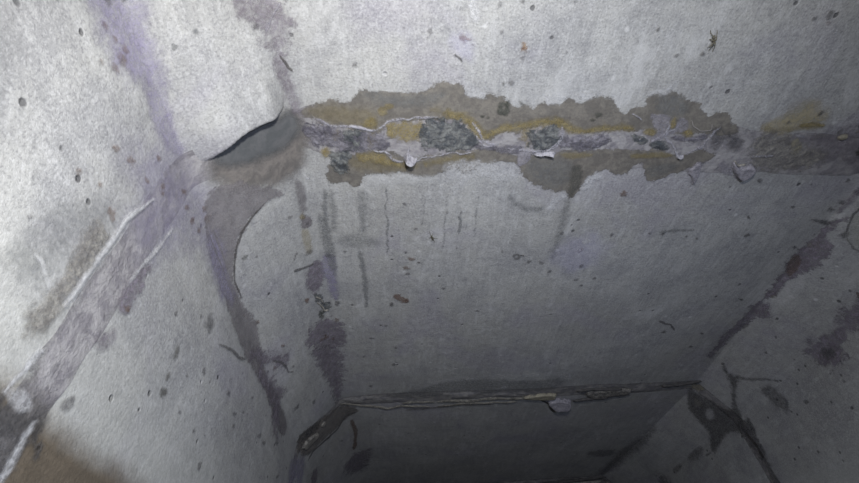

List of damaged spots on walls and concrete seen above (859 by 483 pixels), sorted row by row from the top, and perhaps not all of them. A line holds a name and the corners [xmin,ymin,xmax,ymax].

peeling [316,116,431,132]
peeling [375,148,471,167]
peeling [508,128,564,166]
peeling [633,114,719,160]